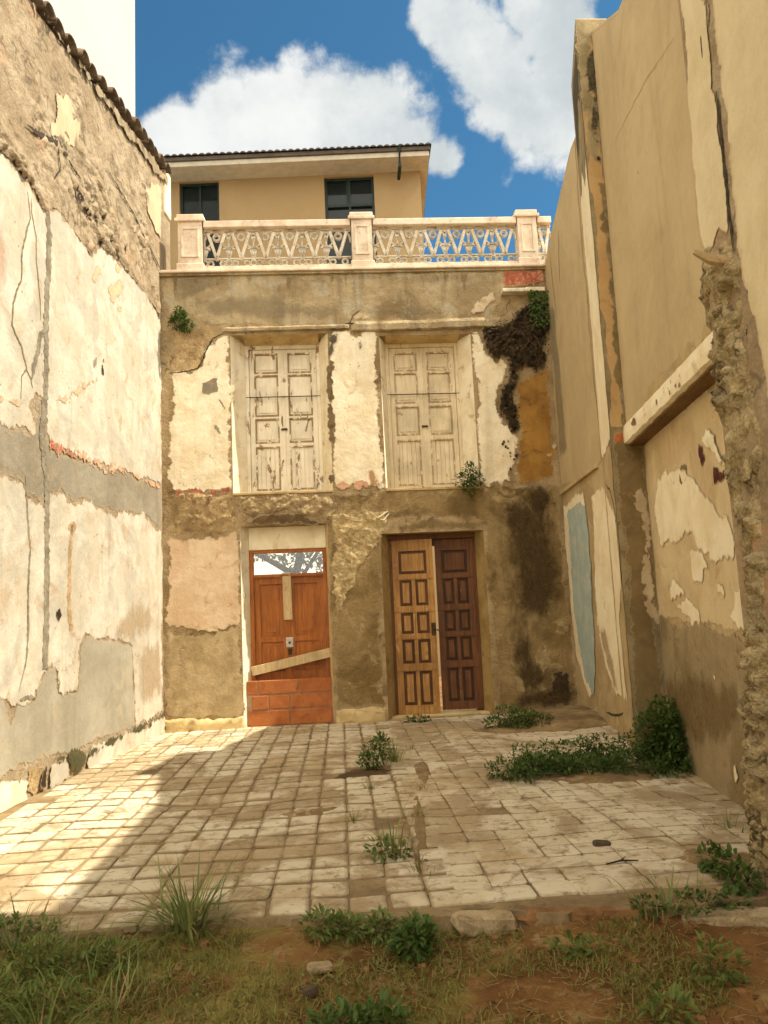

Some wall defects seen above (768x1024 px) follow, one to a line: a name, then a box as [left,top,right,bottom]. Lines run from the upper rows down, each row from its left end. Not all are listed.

crack [700,0,709,54]
flaking render [0,0,221,374]
crack [716,91,734,250]
crack [12,197,41,393]
crack [173,333,224,373]
flaking render [202,378,225,409]
flaking render [598,182,623,391]
flaking render [0,401,387,623]
water stain [506,486,559,615]
water stain [517,636,571,708]
flaking render [563,486,627,702]
spalling [633,240,768,891]